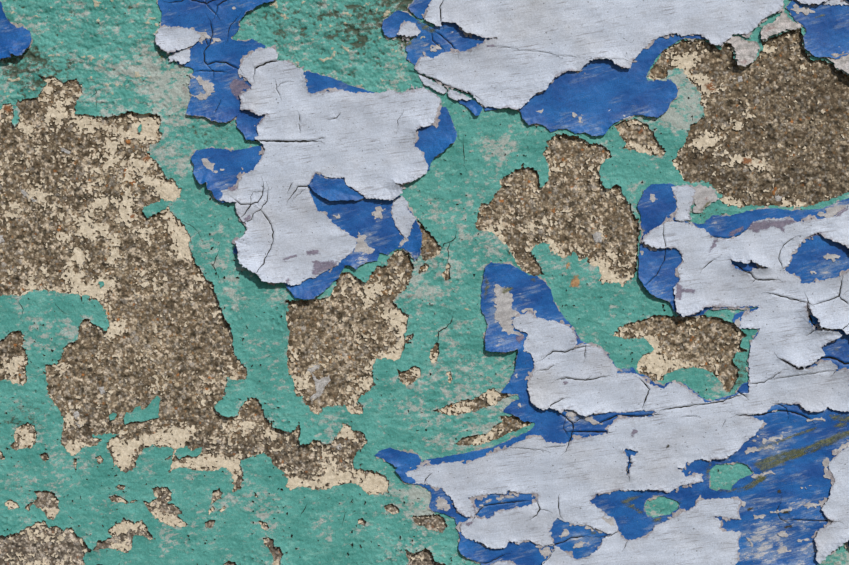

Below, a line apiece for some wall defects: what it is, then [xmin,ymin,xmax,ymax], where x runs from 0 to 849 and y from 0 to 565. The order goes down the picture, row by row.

peeling [0,1,33,60]
crack [244,116,322,143]
spalling [0,75,389,495]
crack [238,179,315,279]
peeling [154,0,457,415]
peeling [375,0,849,565]
crack [639,216,688,292]
crack [704,228,849,335]
spalling [0,490,156,565]
spalling [109,480,188,527]
crack [471,494,560,523]
crack [541,530,627,565]